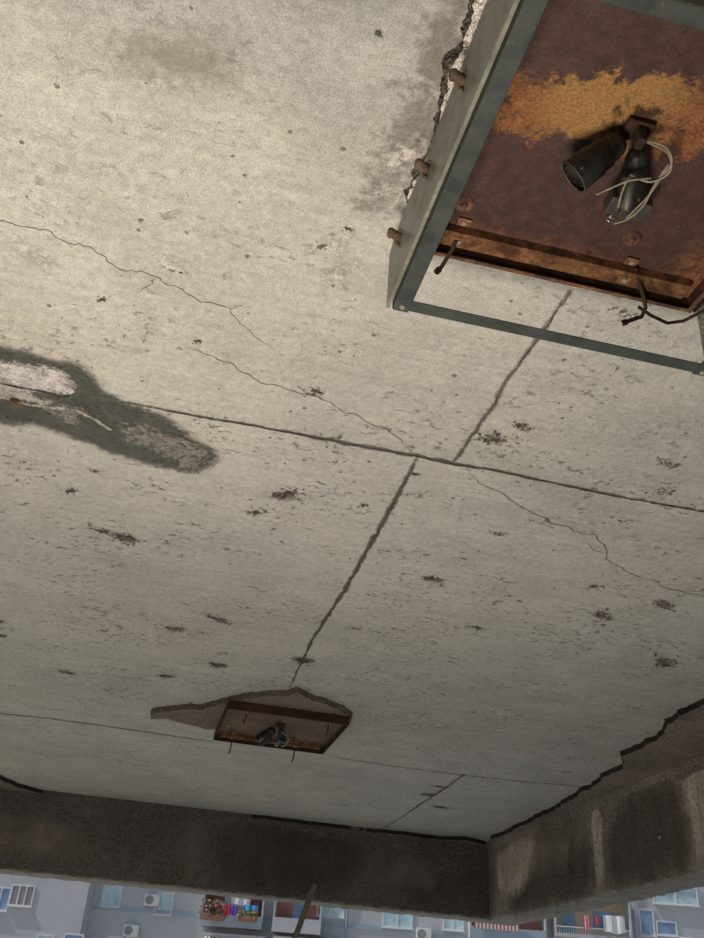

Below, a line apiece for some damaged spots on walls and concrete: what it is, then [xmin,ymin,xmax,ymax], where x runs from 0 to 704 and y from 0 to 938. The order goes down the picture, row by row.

spalling [403,0,474,203]
crack [0,220,276,352]
crack [2,384,71,397]
leakage [0,349,216,473]
crack [190,348,410,450]
crack [466,467,703,596]
spalling [151,687,353,723]
spalling [0,775,44,794]
spalling [251,698,704,845]
leakage [496,770,704,911]